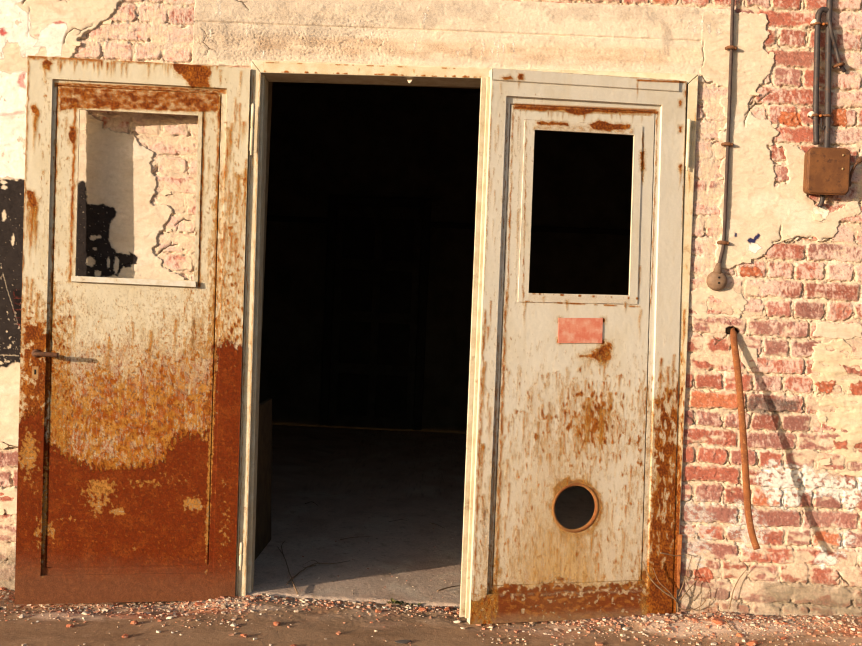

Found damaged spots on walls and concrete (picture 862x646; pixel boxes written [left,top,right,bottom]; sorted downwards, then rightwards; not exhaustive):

flaking render [0,0,124,450]
flaking render [75,110,186,280]
corrosion [490,94,659,304]
flaking render [700,11,862,277]
corrosion [14,55,260,605]
corrosion [470,140,686,625]
flaking render [689,287,747,334]
flaking render [741,346,758,368]
flaking render [808,321,862,477]
flaking render [0,485,17,515]
spalling [694,567,714,583]
water stain [755,459,862,512]